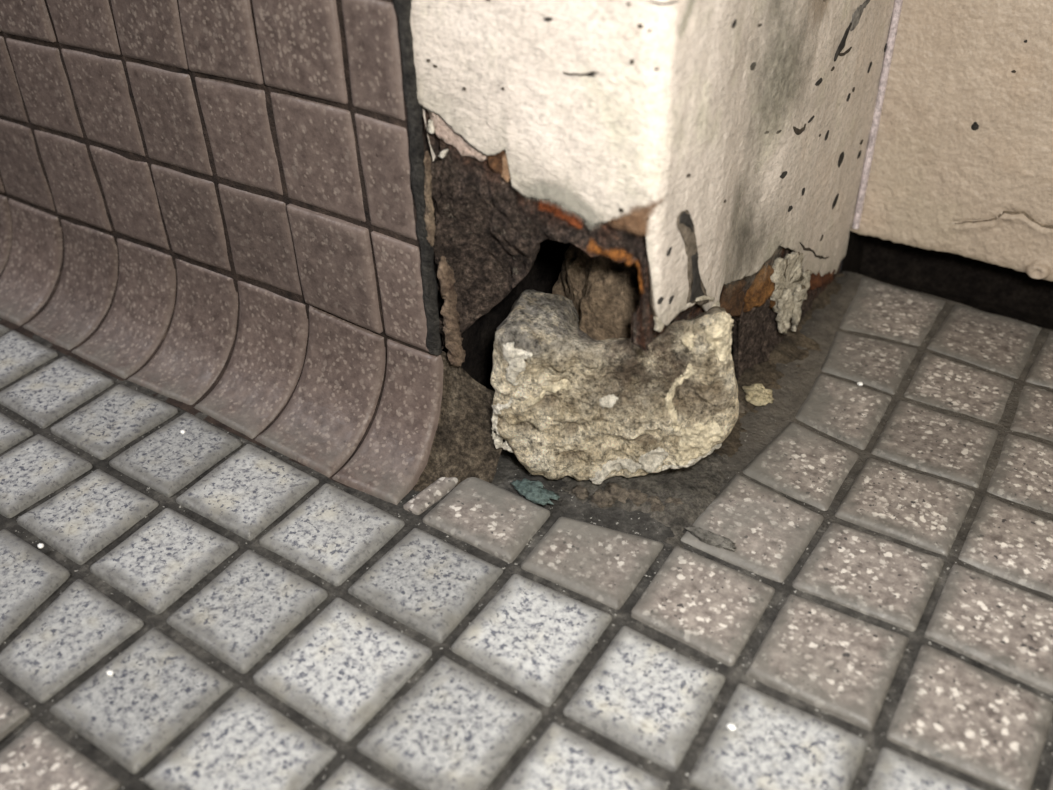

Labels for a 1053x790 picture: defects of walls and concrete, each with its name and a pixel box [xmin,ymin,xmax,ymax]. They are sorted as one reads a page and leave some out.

damp [759,0,806,124]
rust [525,181,662,234]
rust [588,240,643,292]
spalling [423,109,841,380]
rust [719,264,776,317]
rust [809,269,836,290]
crack [955,211,1053,229]